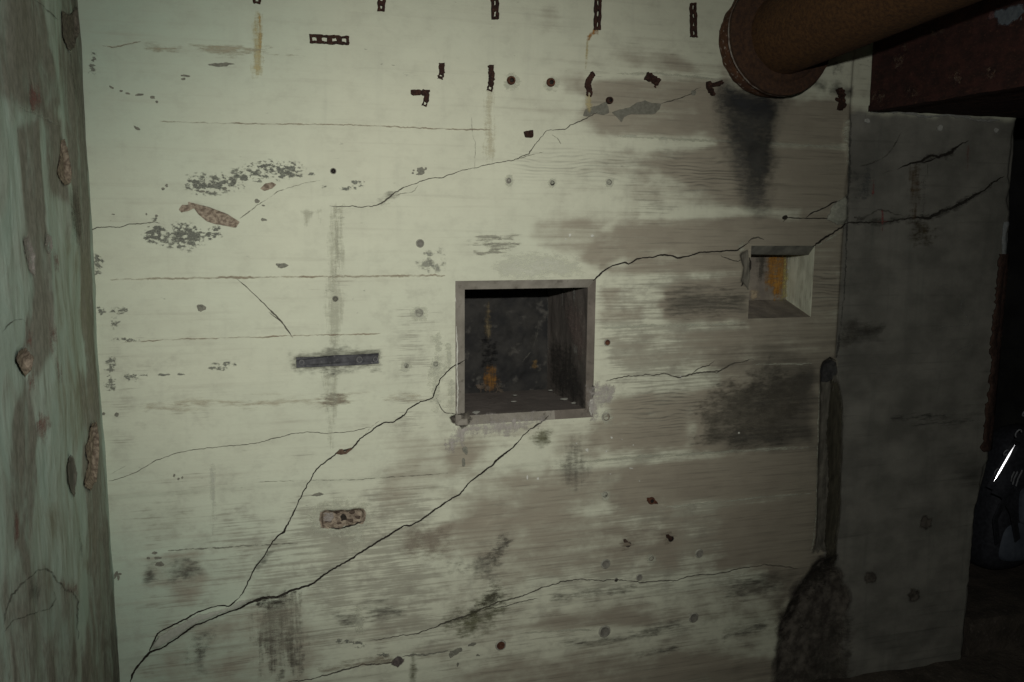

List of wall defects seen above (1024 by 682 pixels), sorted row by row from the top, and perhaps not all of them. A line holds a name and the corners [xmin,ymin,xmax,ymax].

crack [333,112,597,208]
spalling [143,161,314,249]
crack [782,176,1004,247]
crack [593,237,764,281]
crack [607,359,749,381]
spalling [67,412,119,497]
crack [112,361,549,682]
spalling [310,492,368,543]
crack [288,564,798,682]